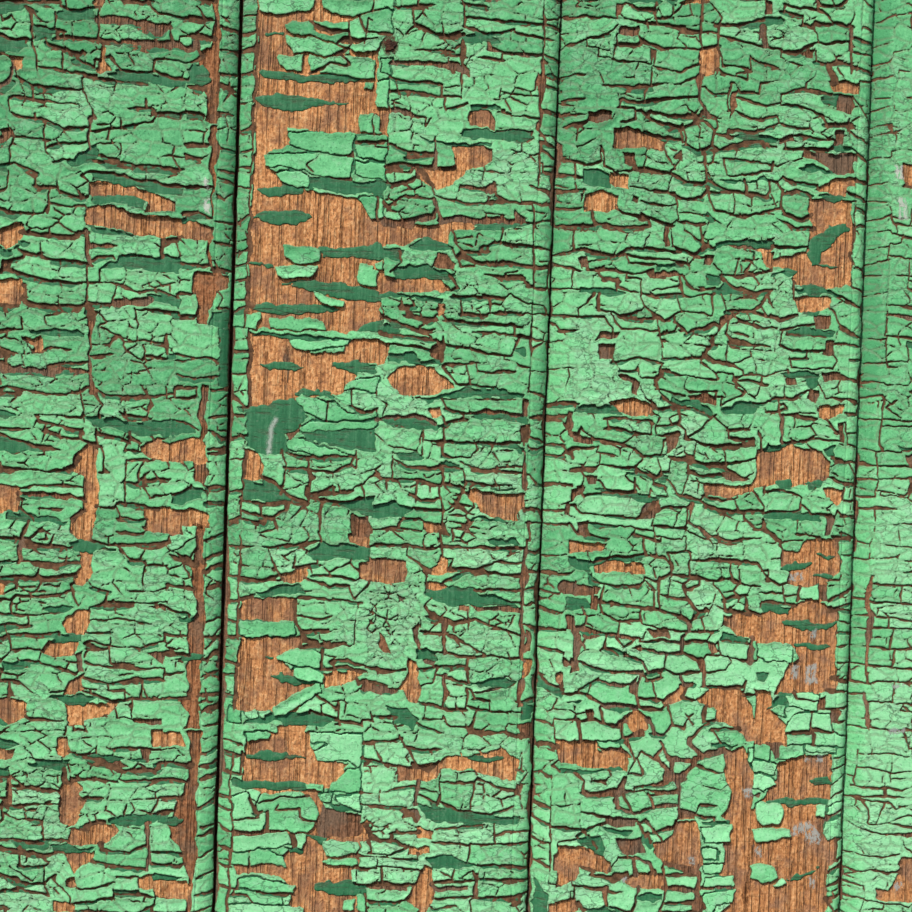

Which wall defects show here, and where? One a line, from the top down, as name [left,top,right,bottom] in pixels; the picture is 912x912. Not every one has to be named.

crack [853,149,900,187]
crack [766,237,809,258]
crack [349,388,437,428]
peeling [0,0,240,912]
peeling [215,0,912,912]
crack [785,560,912,758]
crack [88,821,187,874]
crack [275,804,318,824]
crack [308,684,609,912]
crack [823,756,912,912]
crack [255,889,293,897]
crack [548,855,733,912]